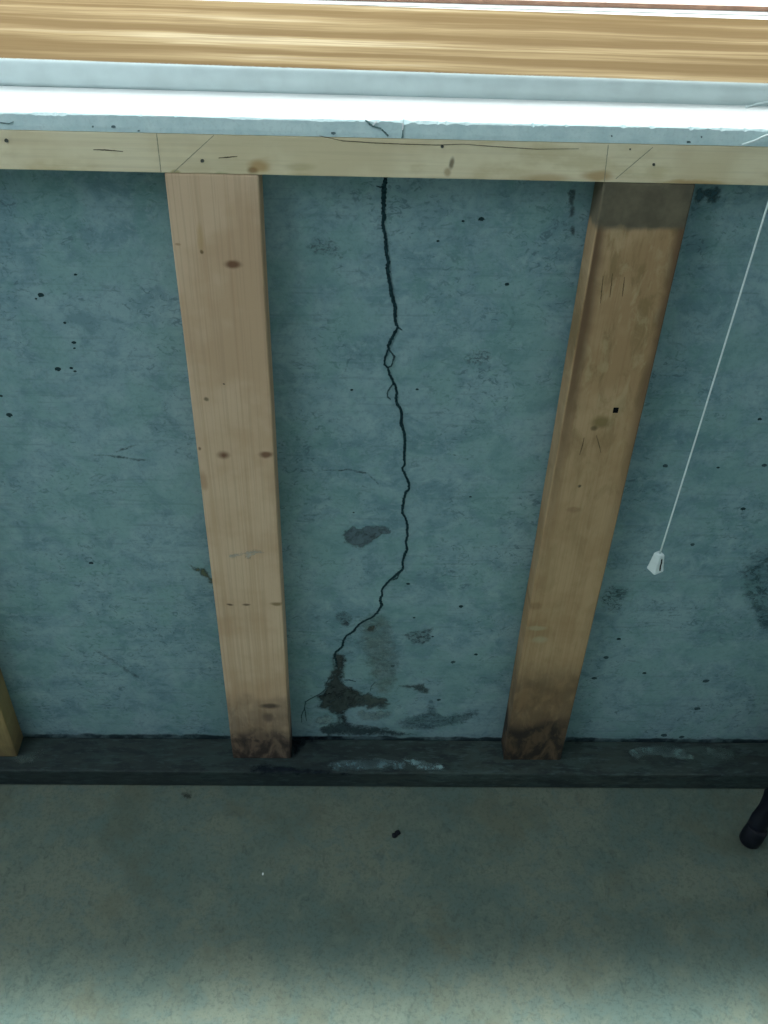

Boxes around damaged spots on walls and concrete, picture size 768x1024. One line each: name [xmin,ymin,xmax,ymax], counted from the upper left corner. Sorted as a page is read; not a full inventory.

crack [365,120,389,137]
crack [301,177,410,723]
water stain [245,654,477,775]